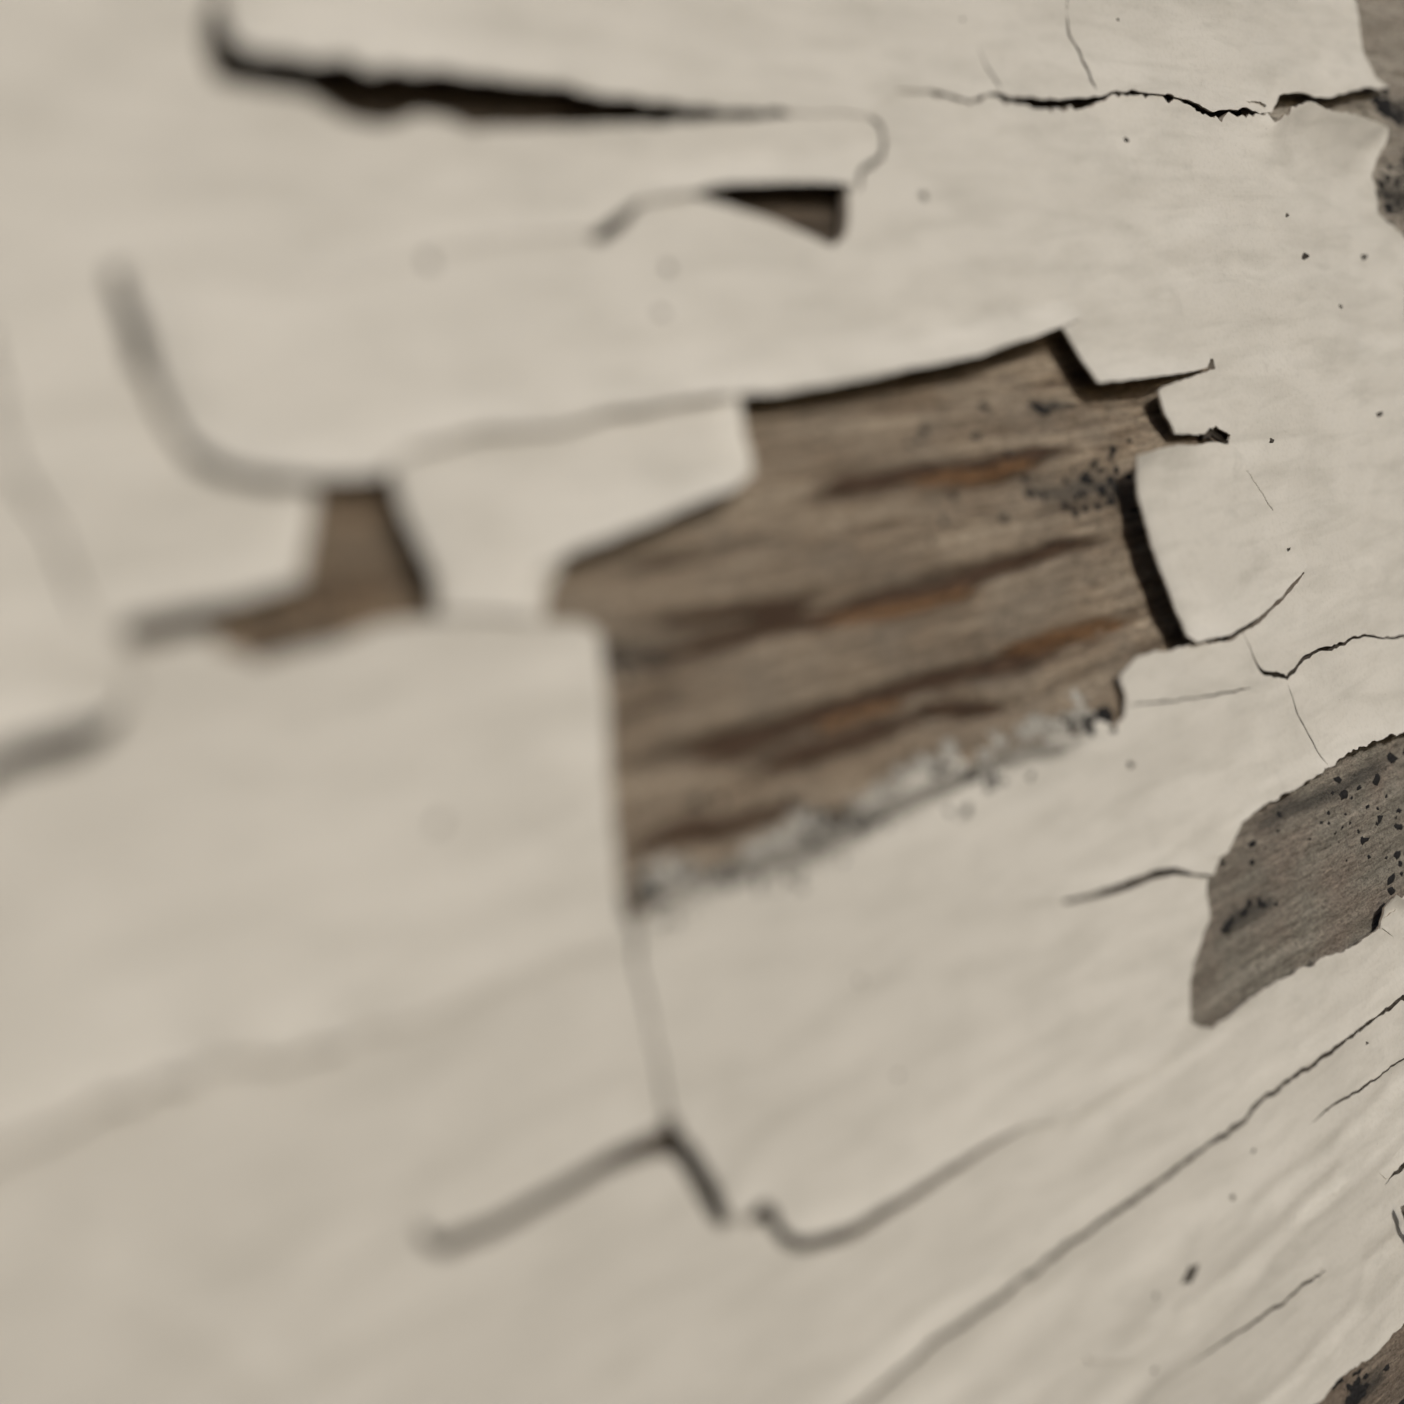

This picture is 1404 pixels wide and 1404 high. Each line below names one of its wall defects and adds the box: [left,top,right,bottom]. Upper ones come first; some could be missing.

peeling [220,0,1404,235]
peeling [0,119,1307,1150]
crack [1122,634,1404,754]
peeling [411,732,1404,1241]
peeling [808,971,1404,1404]
crack [861,995,1404,1404]